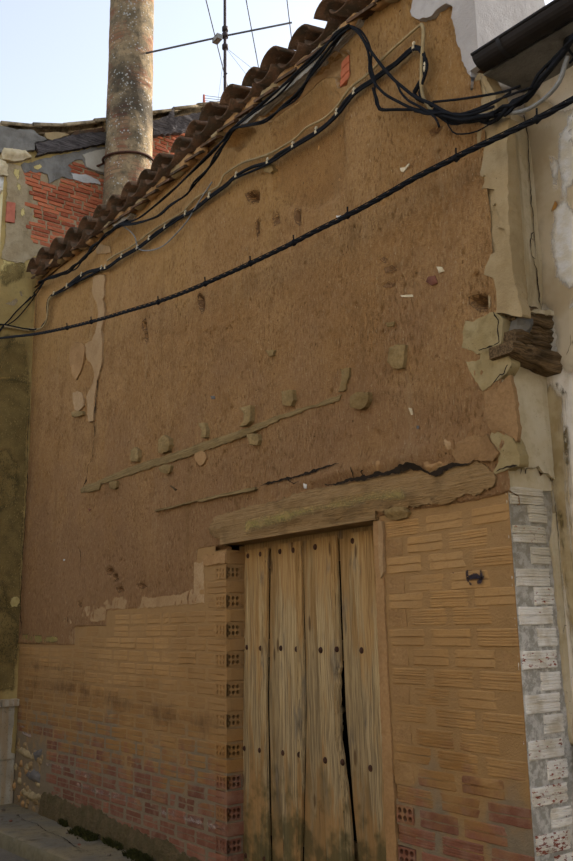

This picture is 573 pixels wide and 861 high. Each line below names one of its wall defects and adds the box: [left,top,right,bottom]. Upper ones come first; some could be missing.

crack [523,115,541,305]
peeling [550,113,573,288]
peeling [69,274,107,422]
peeling [462,118,555,480]
damp [0,335,58,691]
crack [261,460,473,486]
crack [496,465,559,537]